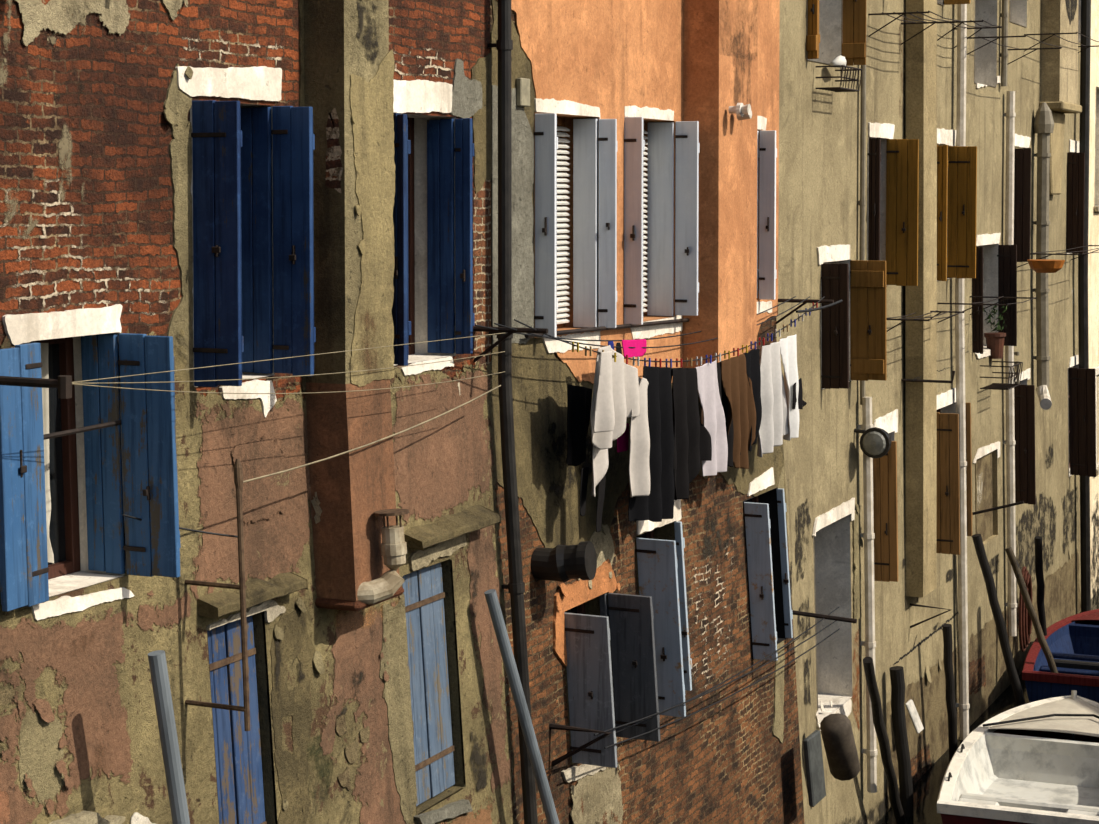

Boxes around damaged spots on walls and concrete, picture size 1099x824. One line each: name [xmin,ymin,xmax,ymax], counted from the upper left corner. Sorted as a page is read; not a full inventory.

flaking render [15,0,130,46]
flaking render [161,0,188,20]
damp [356,0,379,62]
flaking render [163,63,193,141]
flaking render [325,49,395,387]
flaking render [553,525,621,666]
flaking render [270,597,325,824]
flaking render [0,685,74,815]
peeling [130,812,156,824]